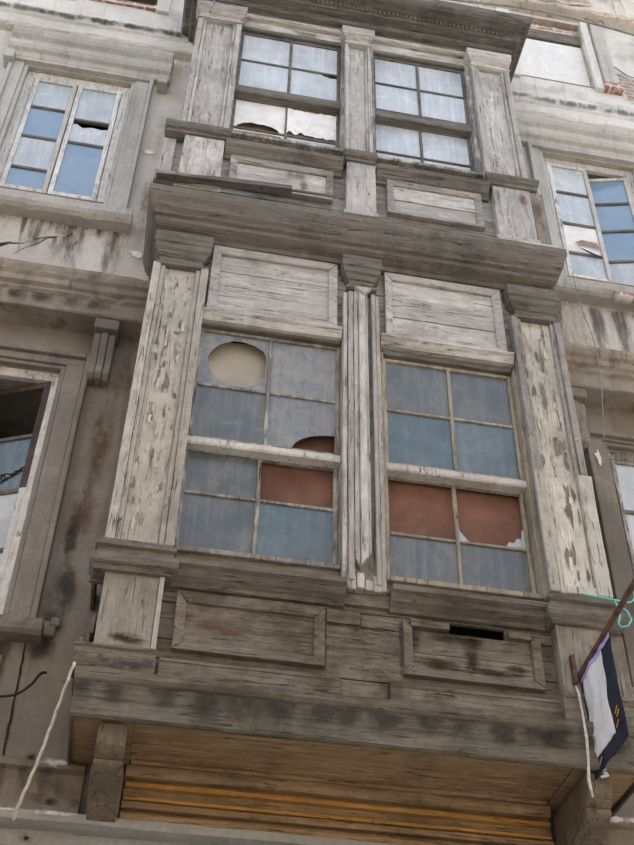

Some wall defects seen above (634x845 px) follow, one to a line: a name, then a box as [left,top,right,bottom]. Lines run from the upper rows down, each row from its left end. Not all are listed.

flaking render [603,69,634,104]
water stain [21,217,83,249]
peeling [154,312,185,398]
peeling [535,325,548,372]
water stain [556,301,628,349]
peeling [532,381,556,410]
peeling [538,418,570,470]
peeling [560,484,591,582]
water stain [38,759,67,786]